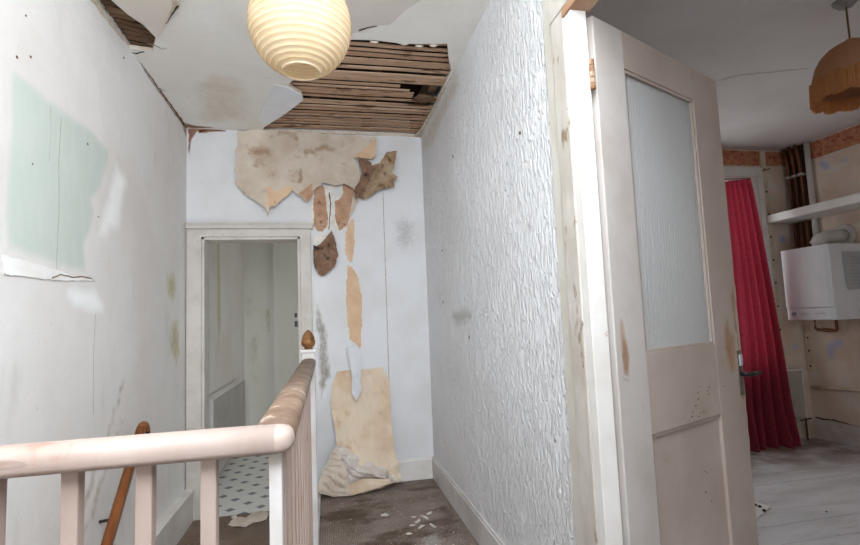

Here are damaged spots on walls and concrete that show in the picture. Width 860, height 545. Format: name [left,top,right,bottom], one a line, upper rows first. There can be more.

spalling [91,0,155,48]
spalling [258,0,454,159]
peeling [2,255,95,281]
peeling [311,183,363,350]